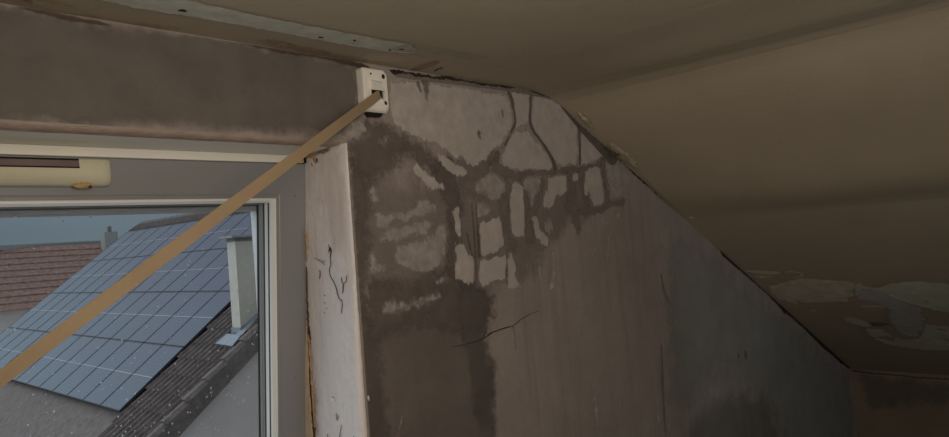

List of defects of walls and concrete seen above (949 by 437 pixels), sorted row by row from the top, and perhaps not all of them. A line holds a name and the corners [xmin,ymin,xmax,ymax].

crack [390,68,666,202]
leakage [0,8,631,437]
crack [305,229,354,437]
crack [454,311,538,350]
crack [720,251,949,380]
flaking render [744,270,949,351]